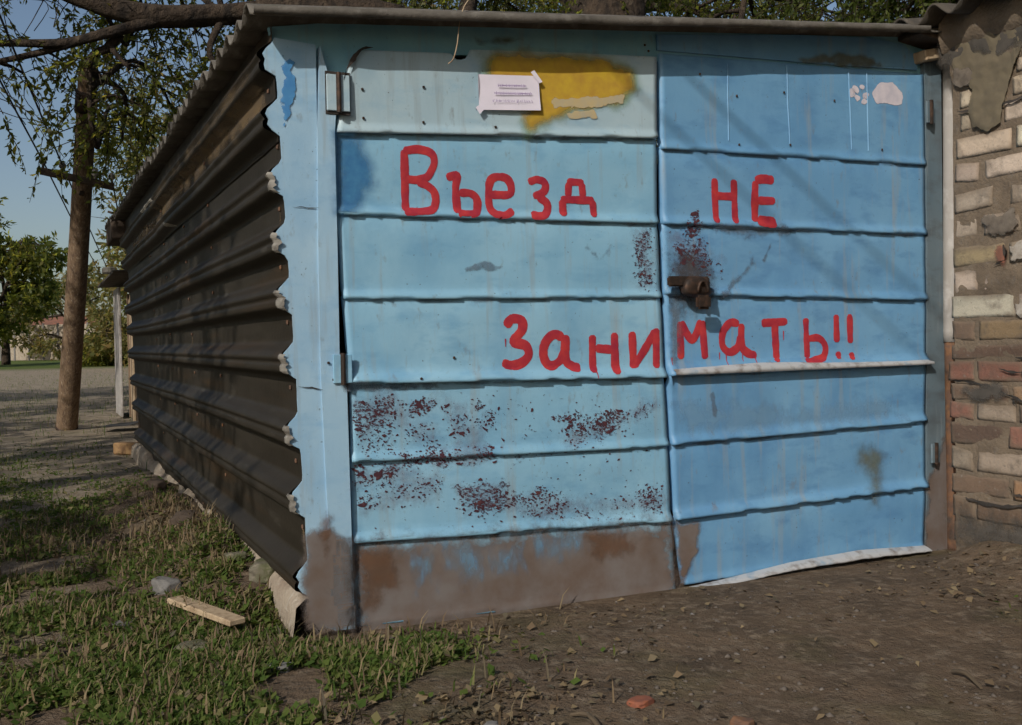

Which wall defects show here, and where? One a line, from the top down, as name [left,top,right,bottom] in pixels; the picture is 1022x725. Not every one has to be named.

rust [632,228,657,292]
rust [669,210,723,276]
spalling [1009,240,1022,261]
rust [299,393,699,633]